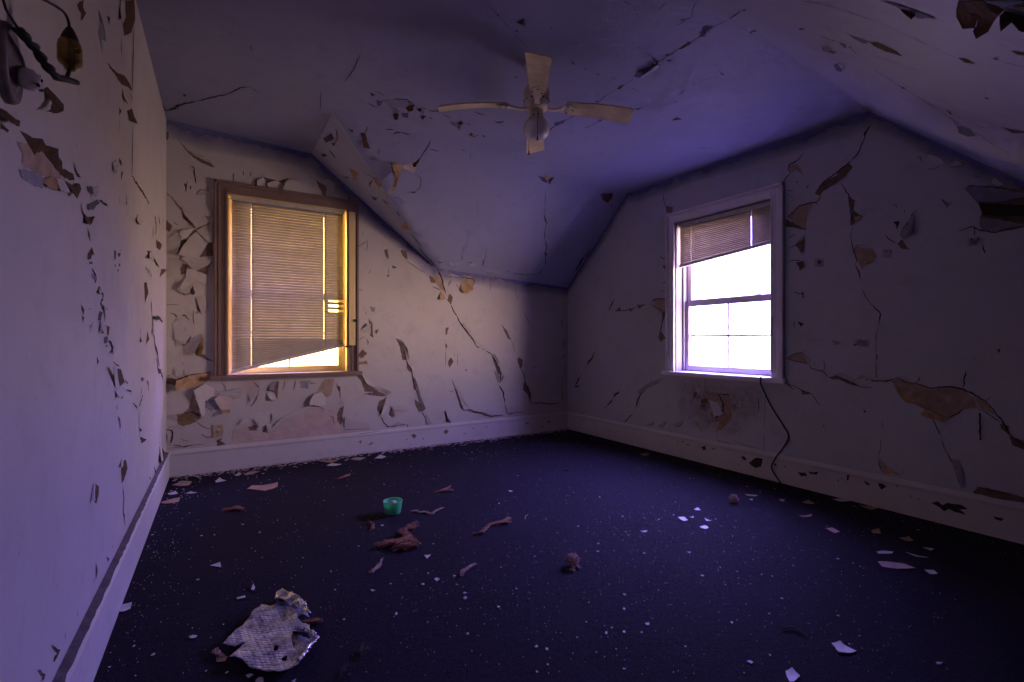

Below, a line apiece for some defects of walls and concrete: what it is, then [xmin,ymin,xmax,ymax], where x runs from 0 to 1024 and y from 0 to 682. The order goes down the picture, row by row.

peeling [43,87,64,113]
peeling [77,0,135,50]
crack [162,87,259,111]
crack [549,1,770,131]
peeling [956,0,1024,39]
peeling [0,108,81,198]
peeling [233,127,430,231]
crack [783,125,871,248]
peeling [137,193,379,445]
crack [357,228,595,427]
crack [787,335,878,405]
peeling [857,372,1024,449]